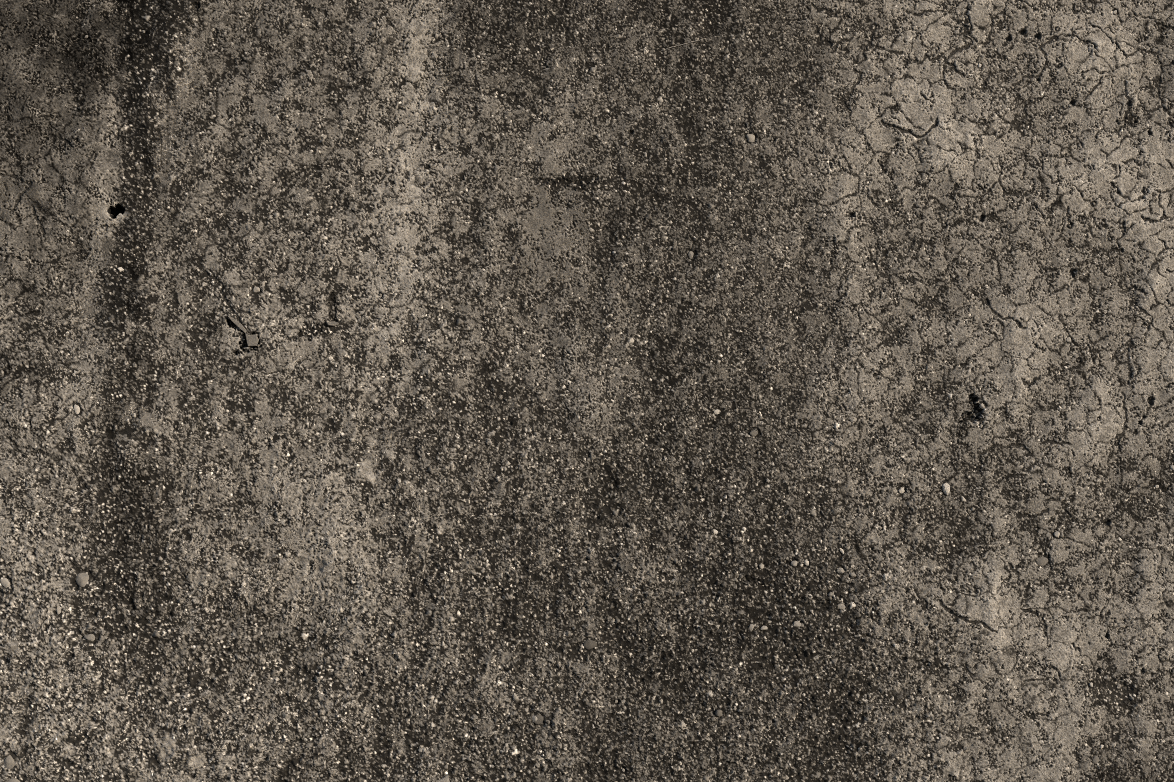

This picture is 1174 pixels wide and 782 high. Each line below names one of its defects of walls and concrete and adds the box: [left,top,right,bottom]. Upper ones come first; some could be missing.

crack [812,0,1174,452]
crack [978,440,1074,522]
crack [939,599,998,677]
crack [1021,609,1047,634]
crack [1023,643,1081,682]